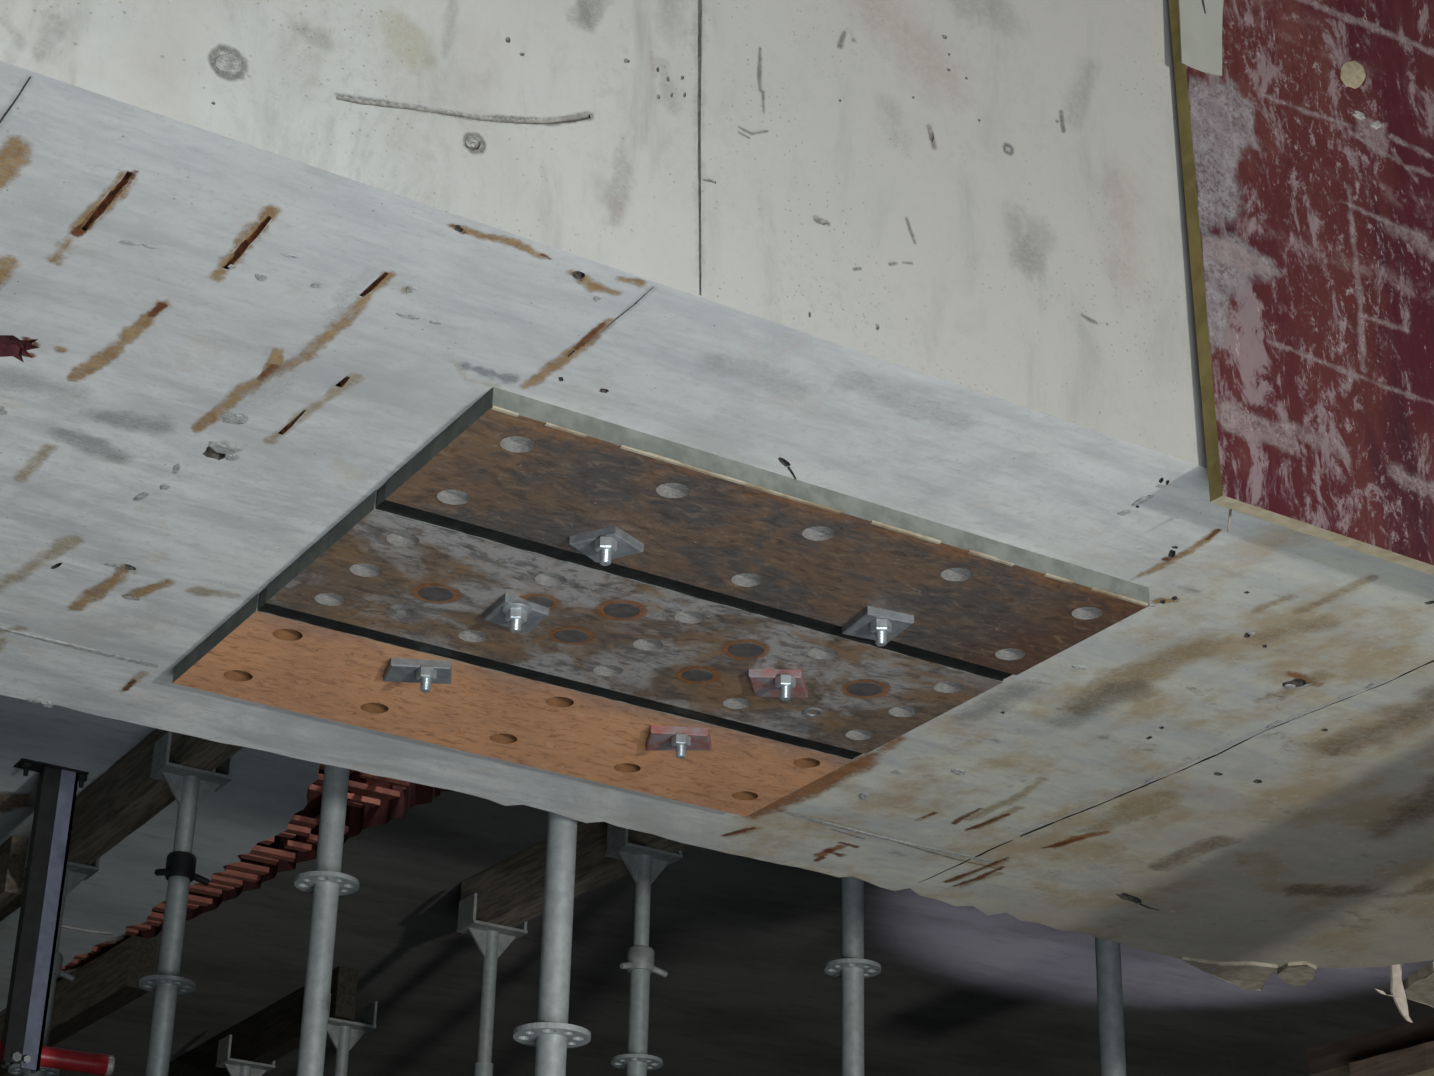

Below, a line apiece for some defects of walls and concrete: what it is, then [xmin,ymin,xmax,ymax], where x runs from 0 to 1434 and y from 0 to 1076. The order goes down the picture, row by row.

crack [0,76,31,123]
corrosion [50,171,137,262]
corrosion [212,206,278,280]
corrosion [68,302,168,381]
corrosion [192,272,395,434]
corrosion [523,319,611,388]
corrosion [70,566,173,610]
corrosion [722,736,904,836]
corrosion [944,858,1007,887]
corrosion [952,808,1010,831]
corrosion [1044,831,1108,848]
crack [919,660,1434,883]